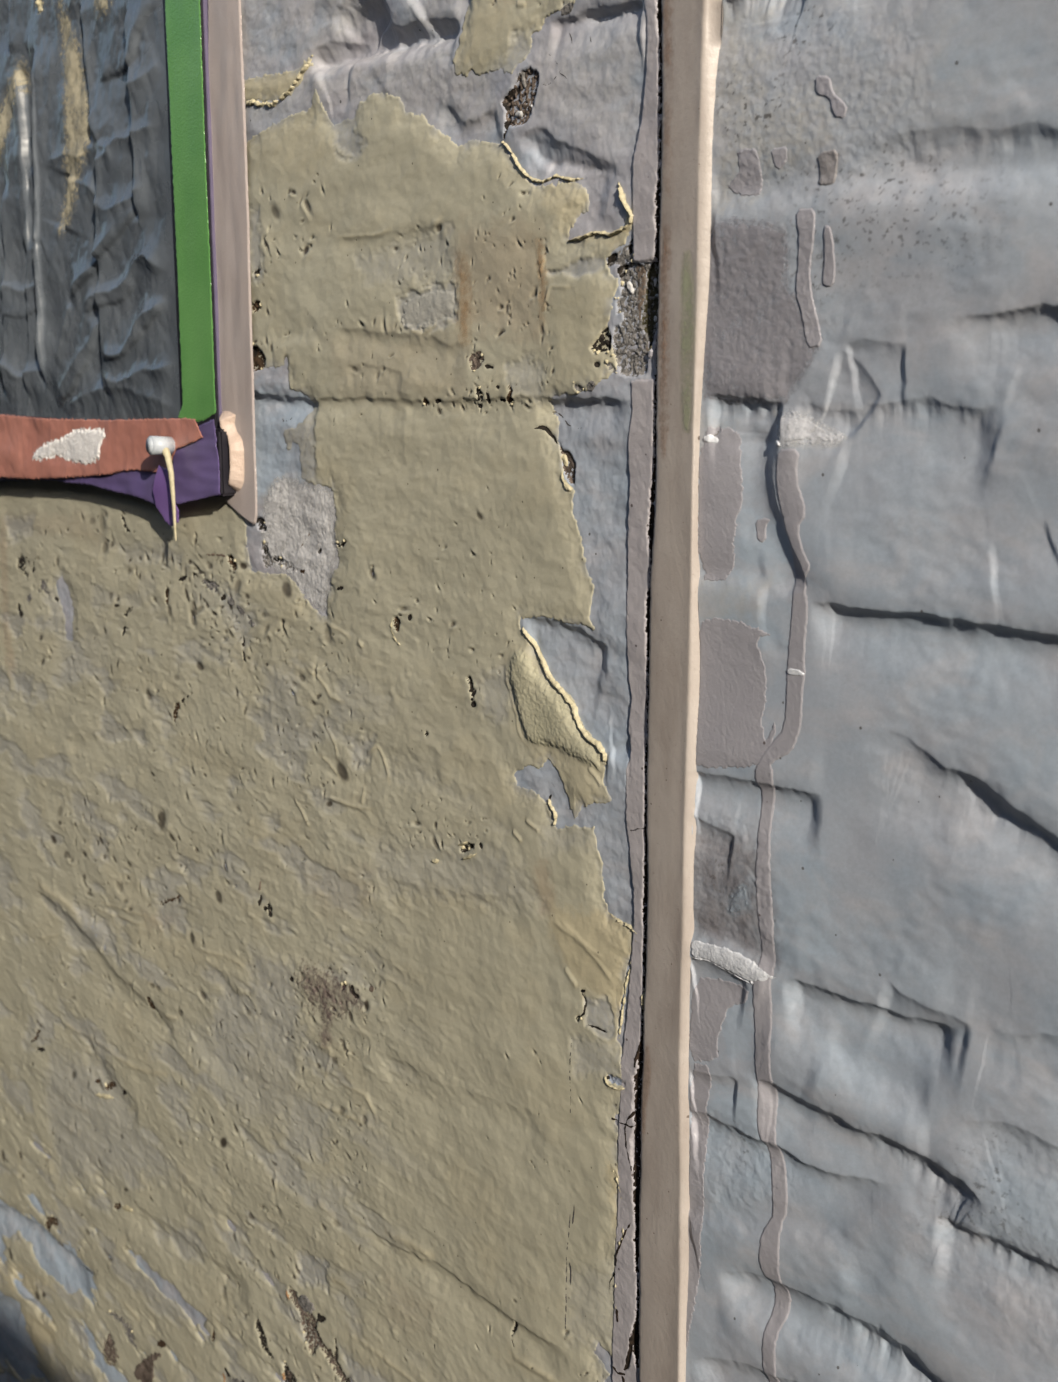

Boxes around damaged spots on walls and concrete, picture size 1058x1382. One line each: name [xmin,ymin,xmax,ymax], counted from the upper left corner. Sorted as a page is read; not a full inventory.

peeling [246,55,314,108]
spalling [501,67,583,184]
crack [654,0,663,262]
spalling [568,182,659,394]
spalling [253,342,266,371]
spalling [469,351,514,408]
spalling [534,425,576,492]
peeling [256,477,346,612]
peeling [548,794,558,826]
crack [610,331,658,1382]
peeling [576,962,645,1039]
spalling [103,1310,166,1382]